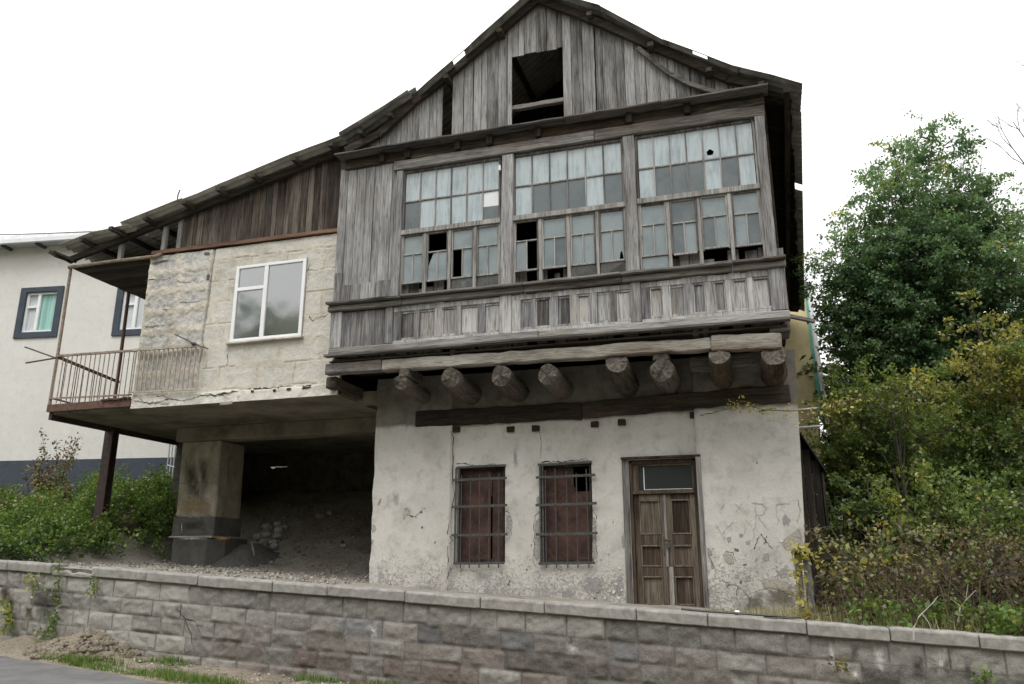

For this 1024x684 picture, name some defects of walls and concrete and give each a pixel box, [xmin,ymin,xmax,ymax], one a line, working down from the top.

flaking render [708,534,791,592]